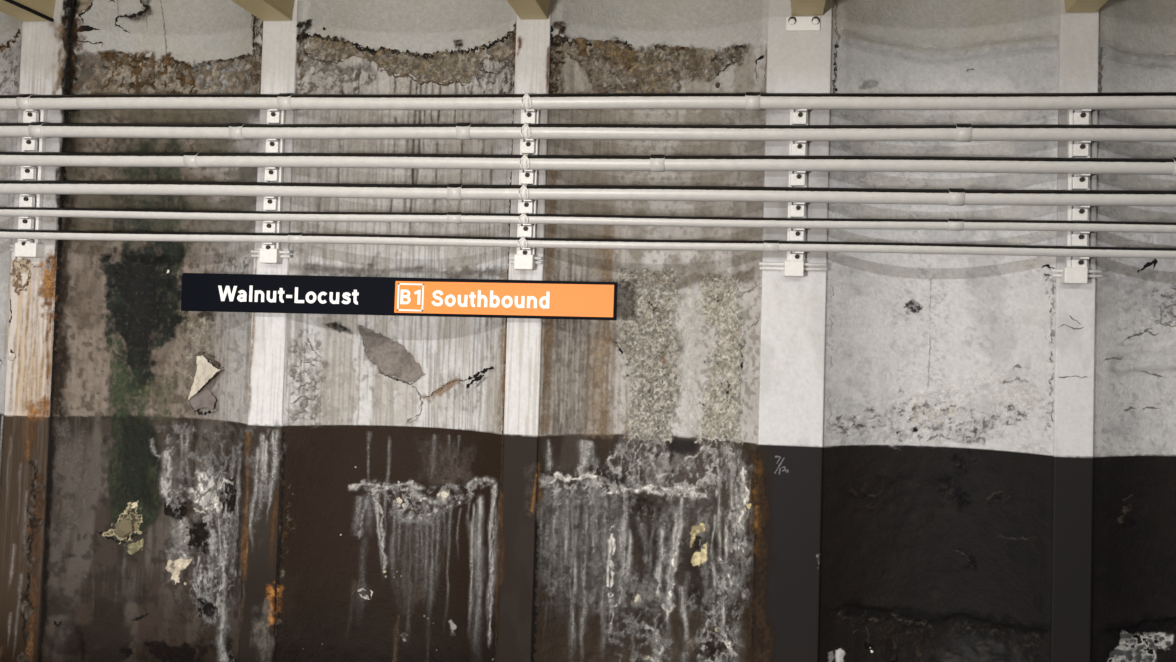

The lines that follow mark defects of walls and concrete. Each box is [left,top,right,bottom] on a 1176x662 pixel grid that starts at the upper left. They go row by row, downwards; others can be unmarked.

flaking render [73,16,263,95]
flaking render [295,19,516,94]
flaking render [549,21,749,94]
damp [547,200,555,281]
peeling [358,325,425,424]
rust [9,255,55,662]
damp [145,424,281,662]
rust [242,431,251,608]
efflorescence [349,433,498,662]
damp [537,319,754,662]
rust [266,586,282,625]
peeling [1107,630,1174,662]